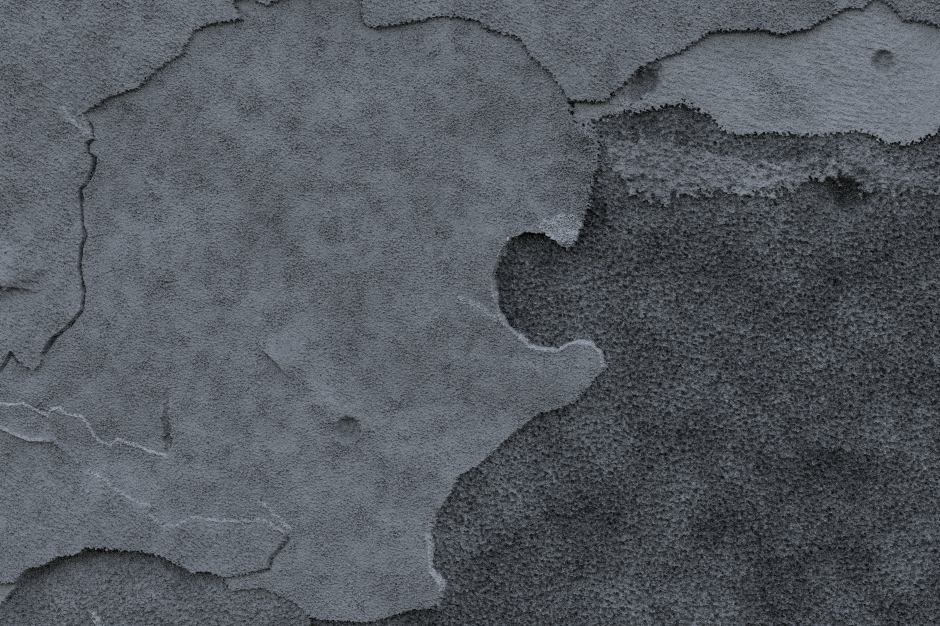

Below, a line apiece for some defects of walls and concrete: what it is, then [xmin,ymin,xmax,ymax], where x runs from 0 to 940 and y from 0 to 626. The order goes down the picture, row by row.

crack [58,106,99,141]
spalling [0,0,603,626]
spalling [311,104,940,626]
spalling [573,0,940,148]